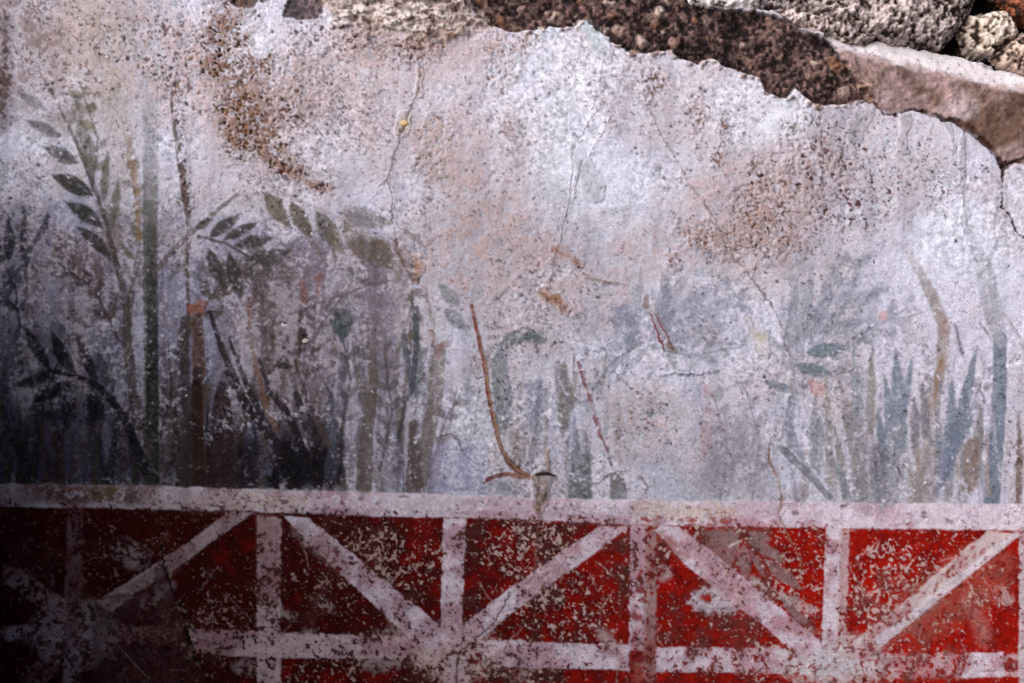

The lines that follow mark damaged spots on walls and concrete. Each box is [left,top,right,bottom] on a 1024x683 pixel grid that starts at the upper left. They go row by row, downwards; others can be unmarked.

crack [371,56,422,284]
flaking render [70,0,1024,276]
crack [545,98,612,310]
flaking render [579,383,691,497]
flaking render [88,553,215,683]